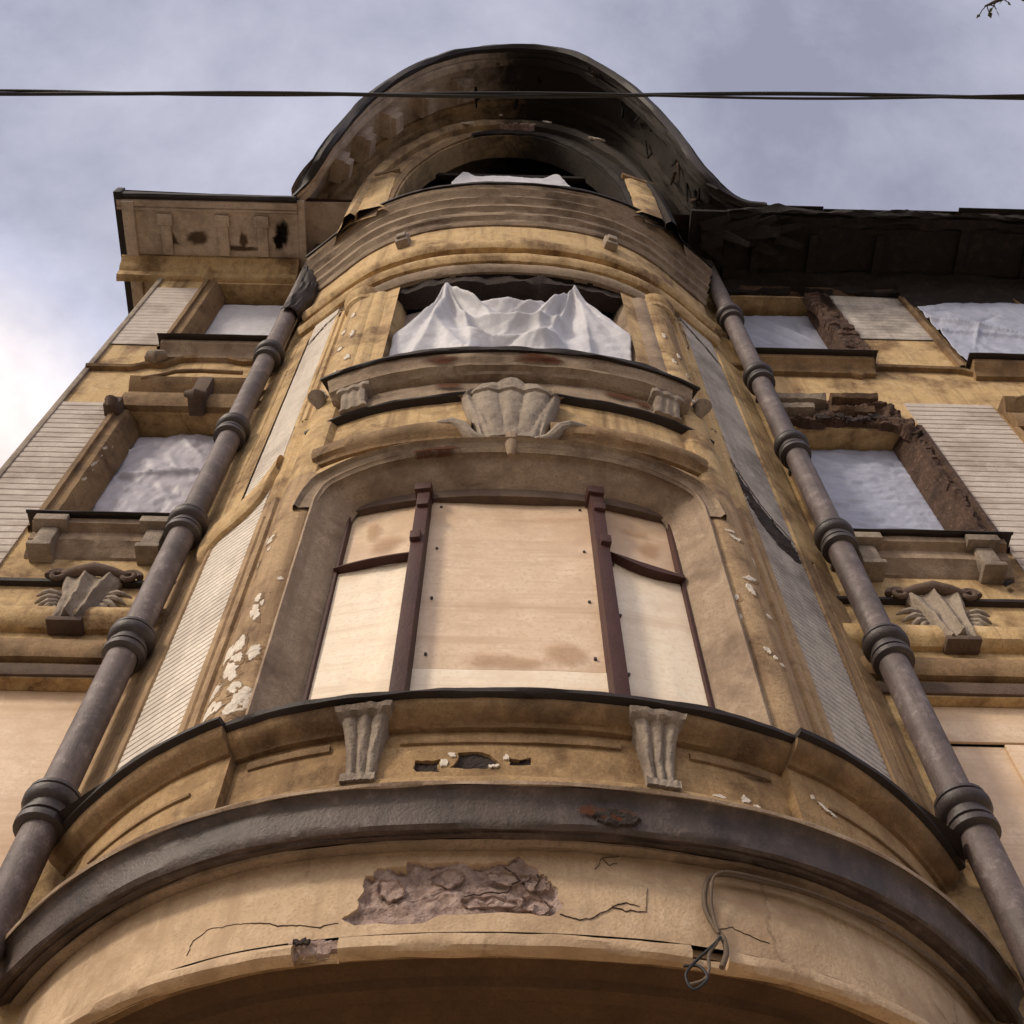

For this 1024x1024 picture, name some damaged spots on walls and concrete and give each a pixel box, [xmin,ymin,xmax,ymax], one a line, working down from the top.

flaking render [802,292,871,350]
flaking render [777,393,922,444]
peeling [256,532,277,572]
peeling [250,591,265,623]
peeling [202,633,266,722]
peeling [414,752,531,772]
flaking render [344,857,563,925]
crack [560,888,648,921]
crack [186,923,338,956]
peeling [288,937,338,963]